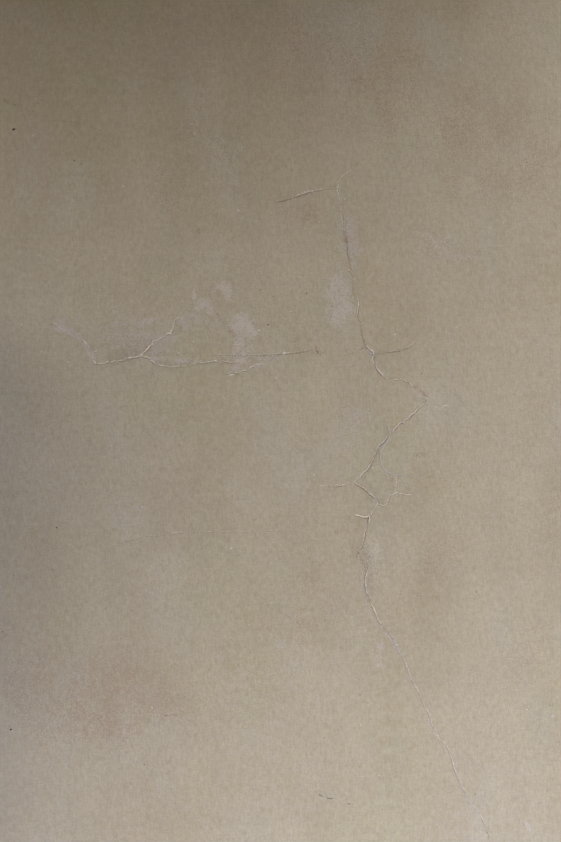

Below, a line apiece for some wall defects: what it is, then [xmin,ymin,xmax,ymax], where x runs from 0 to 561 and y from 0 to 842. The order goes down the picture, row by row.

crack [51,310,322,376]
crack [278,164,492,840]